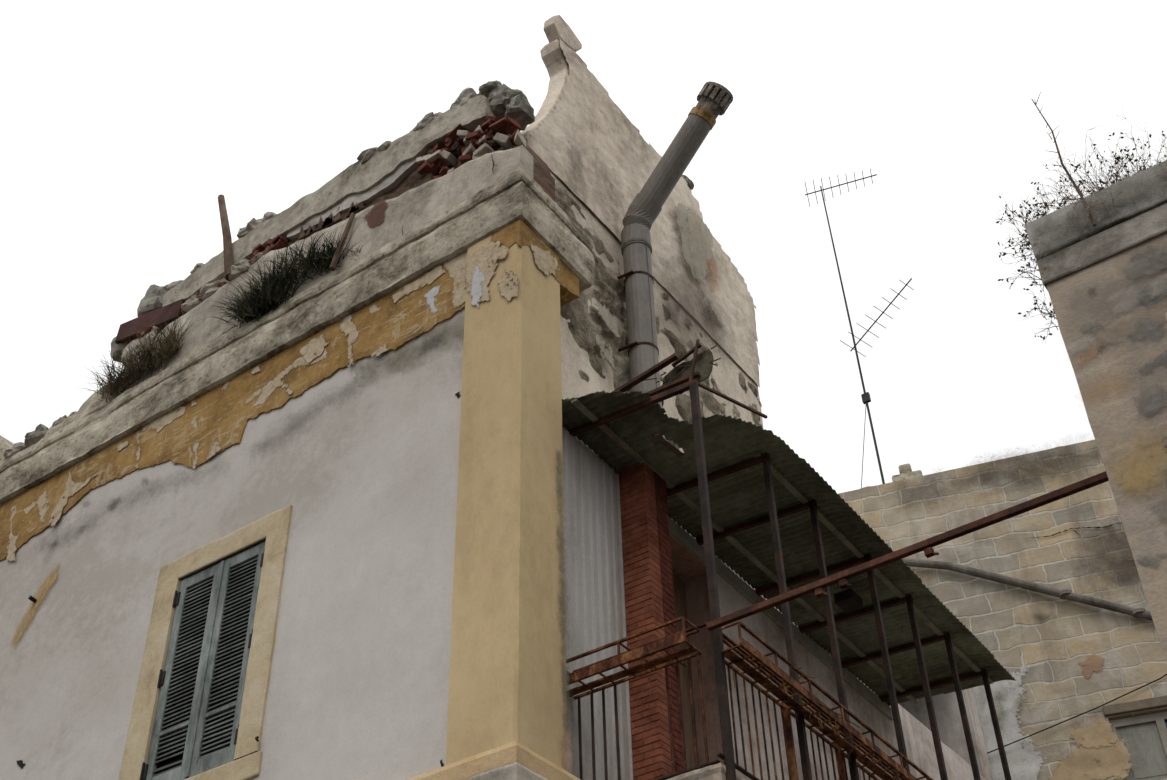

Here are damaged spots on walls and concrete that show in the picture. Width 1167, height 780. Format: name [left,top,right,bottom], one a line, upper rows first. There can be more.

flaking render [286,115,526,246]
peeling [369,239,519,314]
peeling [244,334,329,407]
peeling [339,315,359,367]
peeling [117,399,198,469]
peeling [192,440,221,473]
peeling [6,470,96,561]
crack [1025,522,1122,539]